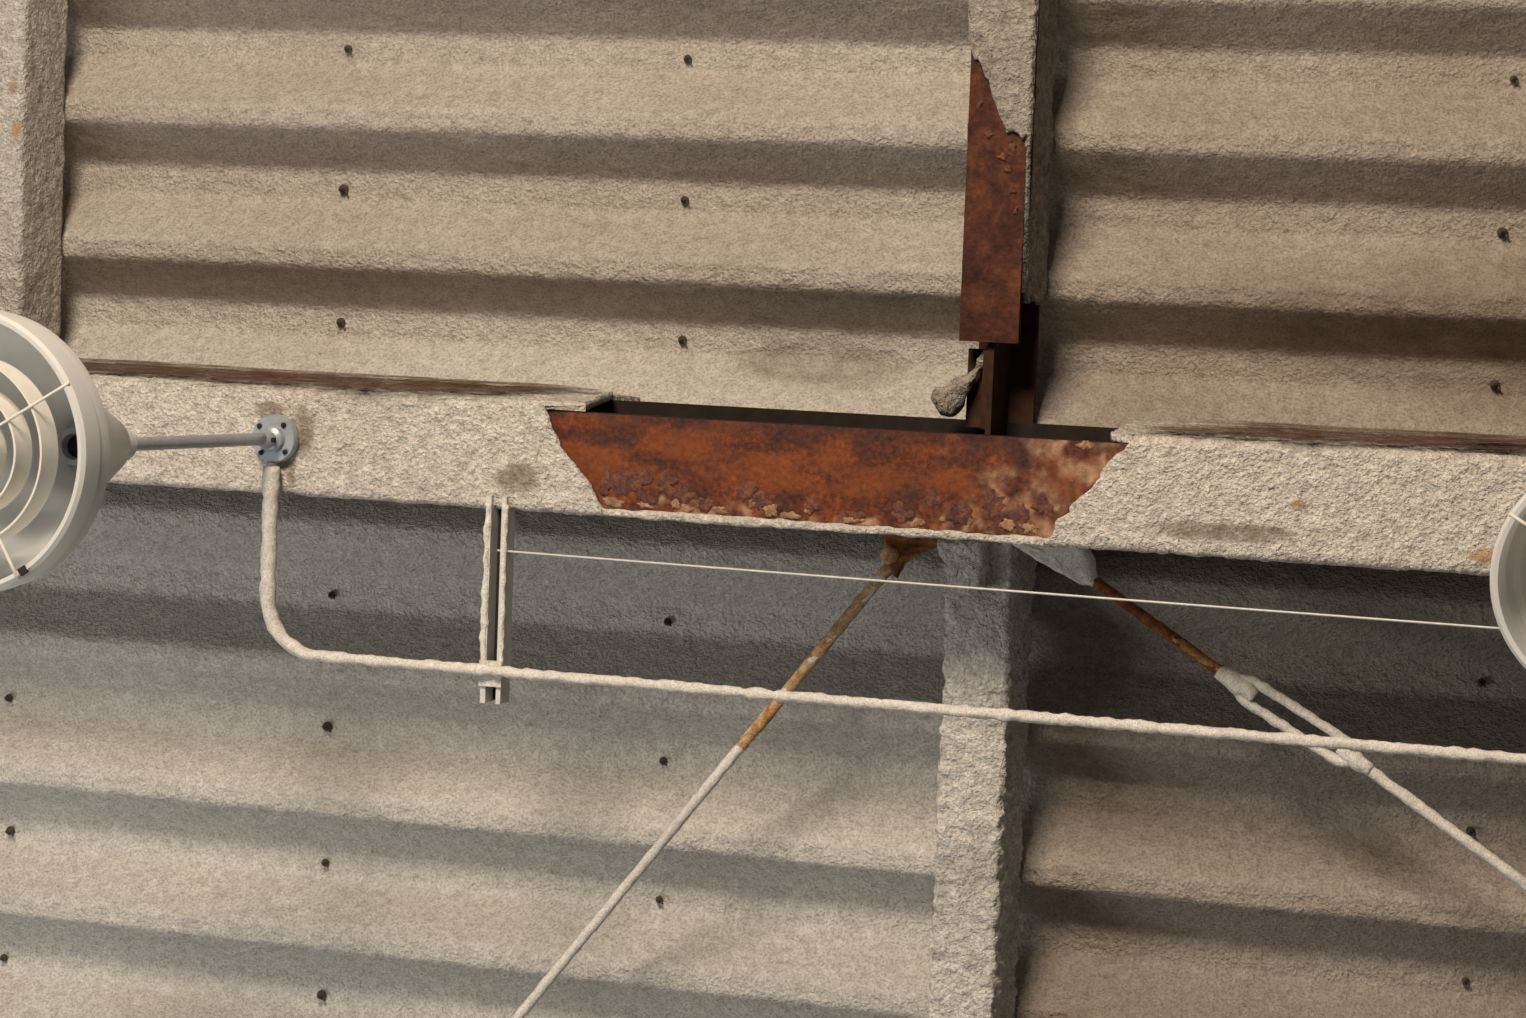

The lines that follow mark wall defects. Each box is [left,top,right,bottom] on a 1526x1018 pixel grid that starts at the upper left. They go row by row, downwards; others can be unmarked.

rust [736,563,891,751]
rust [1092,577,1222,674]